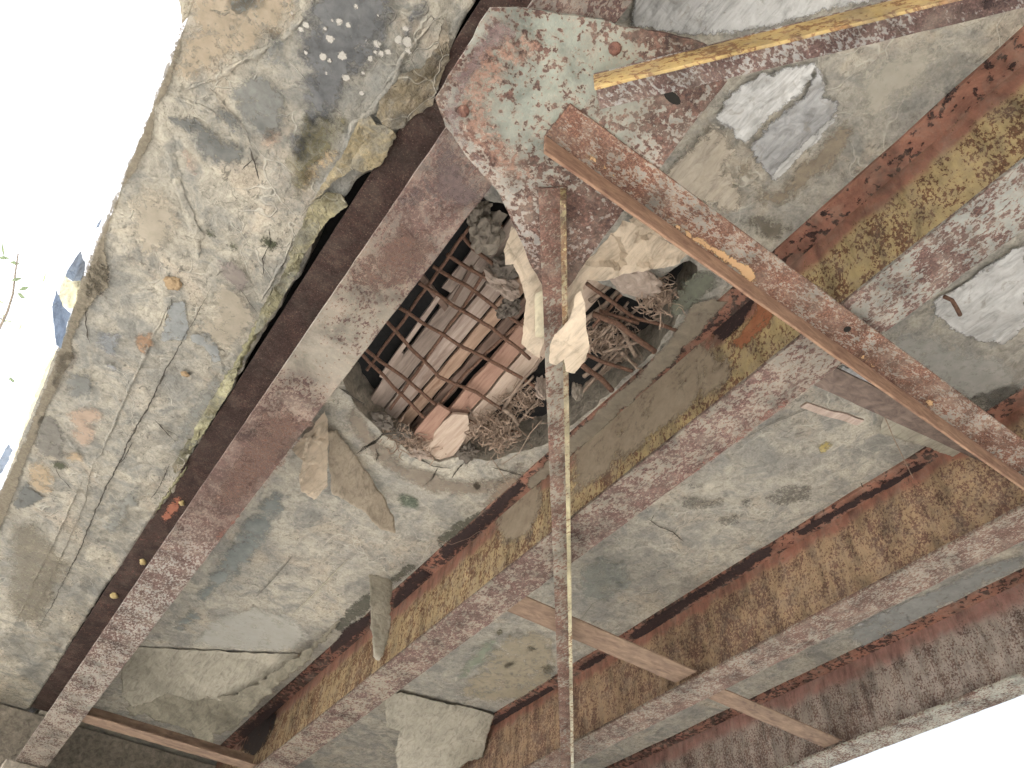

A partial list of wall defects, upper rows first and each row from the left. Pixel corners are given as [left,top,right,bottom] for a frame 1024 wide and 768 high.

leakage [168,0,424,190]
spalling [362,226,546,431]
spalling [585,282,678,354]
corrosion [713,299,773,349]
crack [40,270,224,626]
corrosion [161,497,182,523]
corrosion [439,482,524,562]
corrosion [796,463,925,535]
corrosion [393,570,430,608]
corrosion [629,545,773,639]
corrosion [330,615,371,653]
corrosion [238,702,284,755]